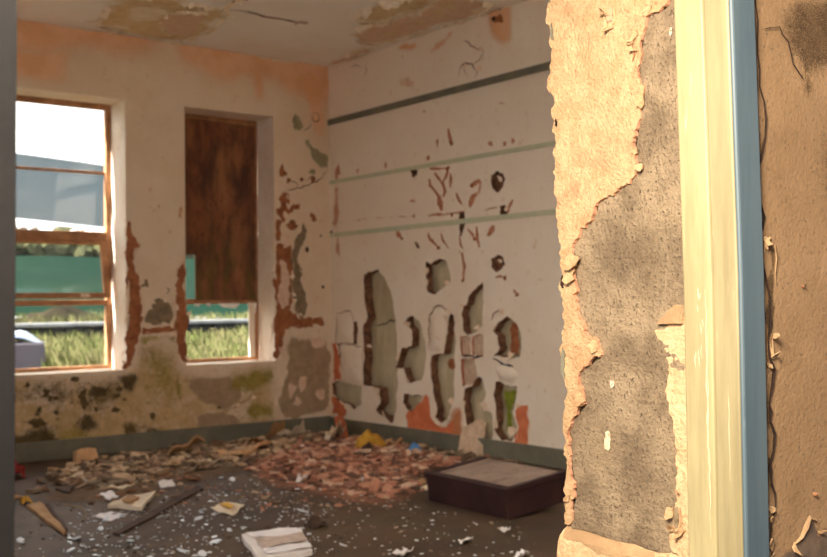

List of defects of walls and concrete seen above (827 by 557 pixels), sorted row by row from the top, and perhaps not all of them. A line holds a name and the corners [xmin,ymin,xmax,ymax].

crack [239,10,307,25]
crack [755,0,803,164]
leakage [781,0,827,98]
flaking render [491,171,505,192]
leakage [15,335,280,444]
flaking render [270,193,531,444]
flaking render [560,0,685,557]
crack [761,203,776,557]